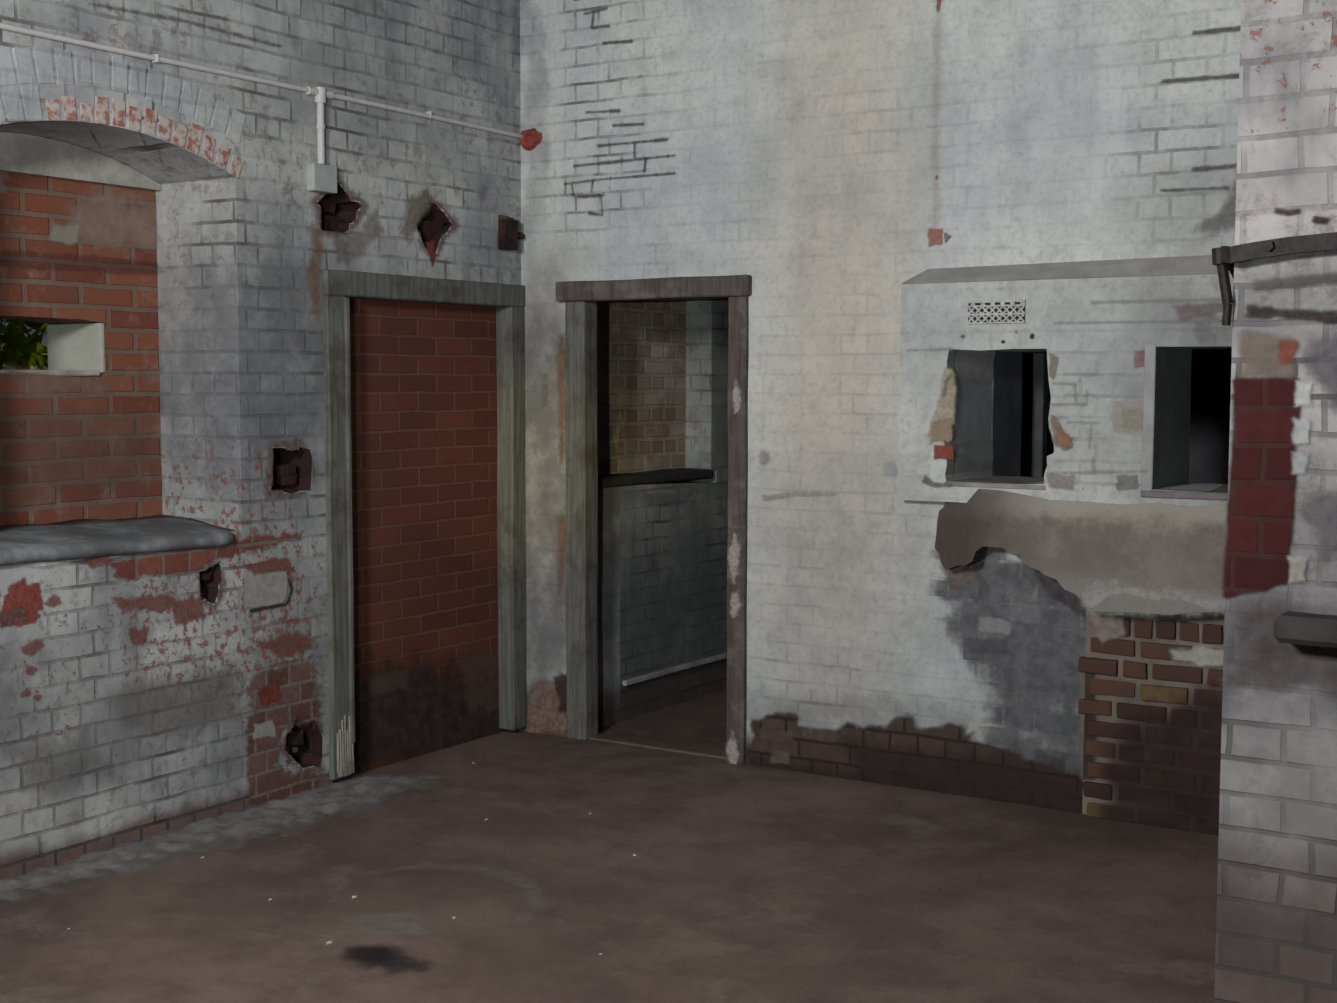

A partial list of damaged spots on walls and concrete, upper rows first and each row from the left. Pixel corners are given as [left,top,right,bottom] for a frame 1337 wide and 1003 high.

flaking render [46,96,244,178]
spalling [314,178,366,236]
spalling [415,192,457,256]
damp [1203,184,1236,231]
spalling [266,442,314,497]
spalling [0,579,61,627]
flaking render [84,533,300,644]
flaking render [726,332,1311,836]
spalling [20,639,44,700]
flaking render [246,631,322,803]